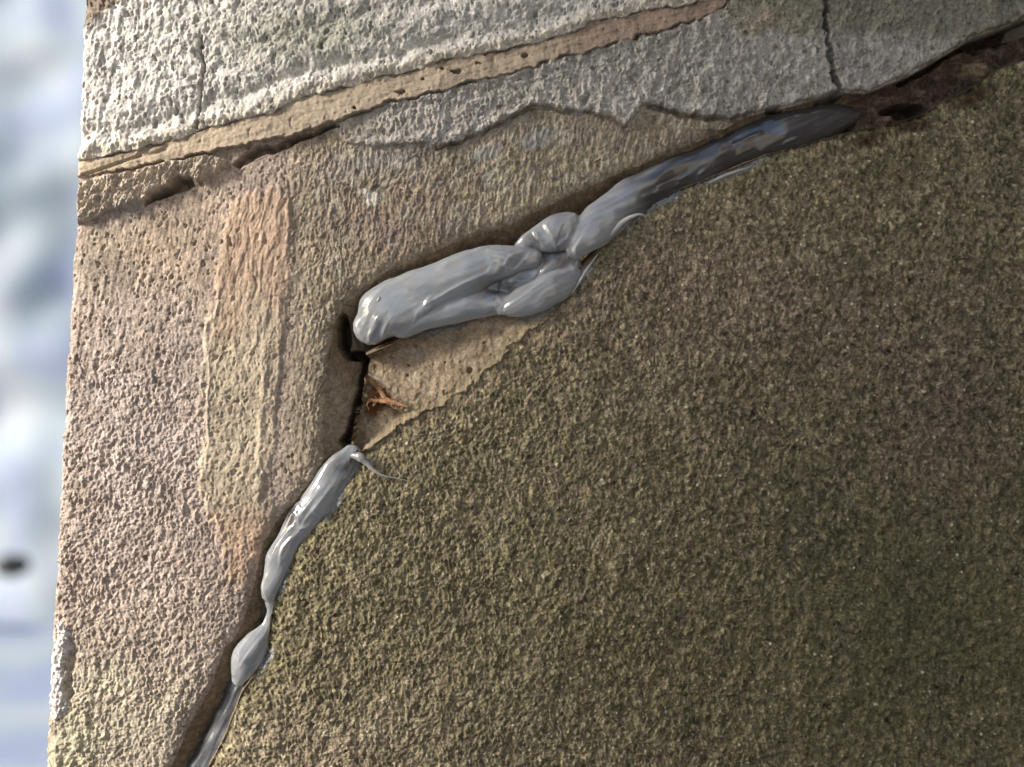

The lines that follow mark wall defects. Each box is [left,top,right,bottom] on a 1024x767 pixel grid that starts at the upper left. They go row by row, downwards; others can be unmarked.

spalling [76,128,327,225]
spalling [354,290,578,452]
crack [172,0,852,767]